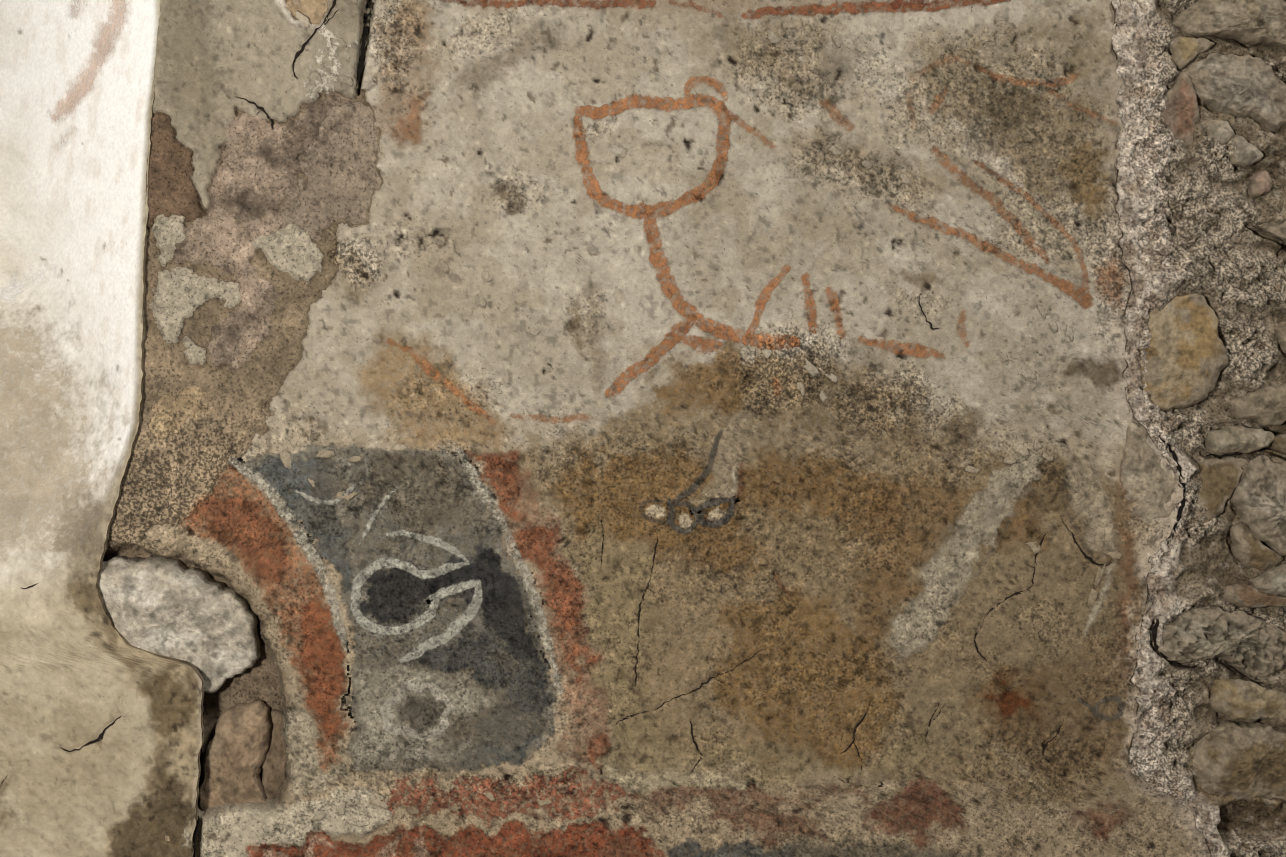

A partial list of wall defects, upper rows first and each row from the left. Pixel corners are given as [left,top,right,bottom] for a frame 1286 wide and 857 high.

crack [292,0,371,93]
spalling [103,0,383,559]
crack [616,537,761,775]
crack [974,518,1111,662]